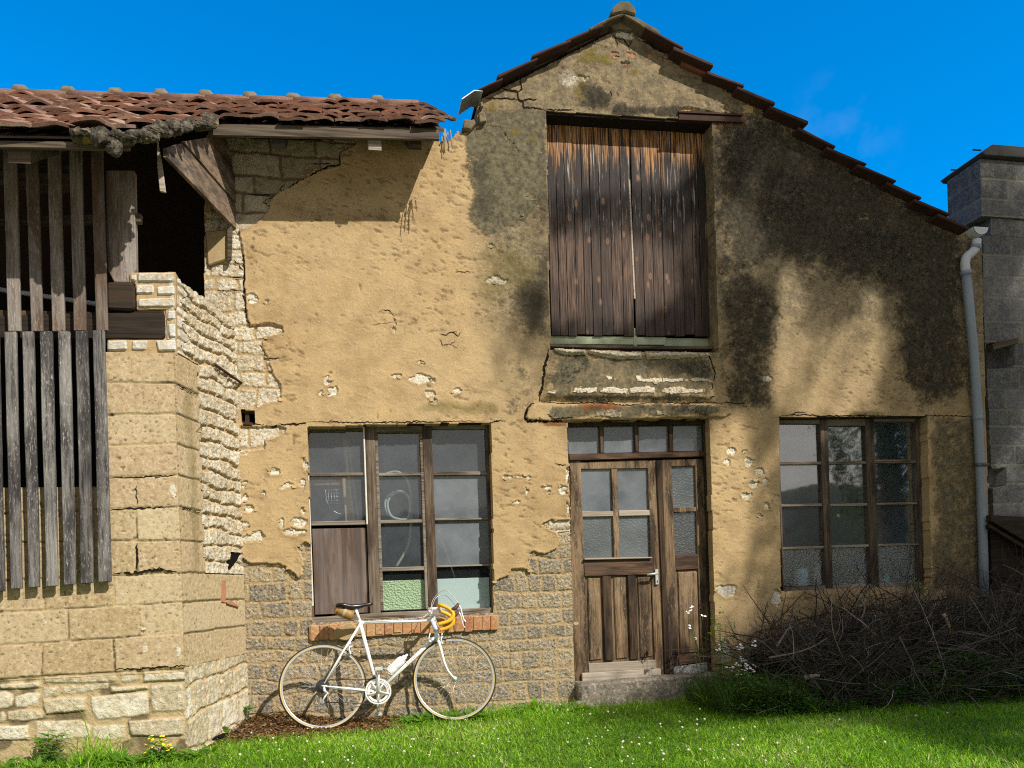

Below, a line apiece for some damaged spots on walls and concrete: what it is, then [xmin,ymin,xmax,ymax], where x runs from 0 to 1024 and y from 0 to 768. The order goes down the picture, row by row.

crack [487,76,572,111]
flaking render [204,138,356,409]
damp [514,257,549,330]
mould [675,112,971,406]
flaking render [391,361,437,404]
crack [254,349,746,428]
flaking render [723,447,770,500]
flaking render [226,463,579,719]